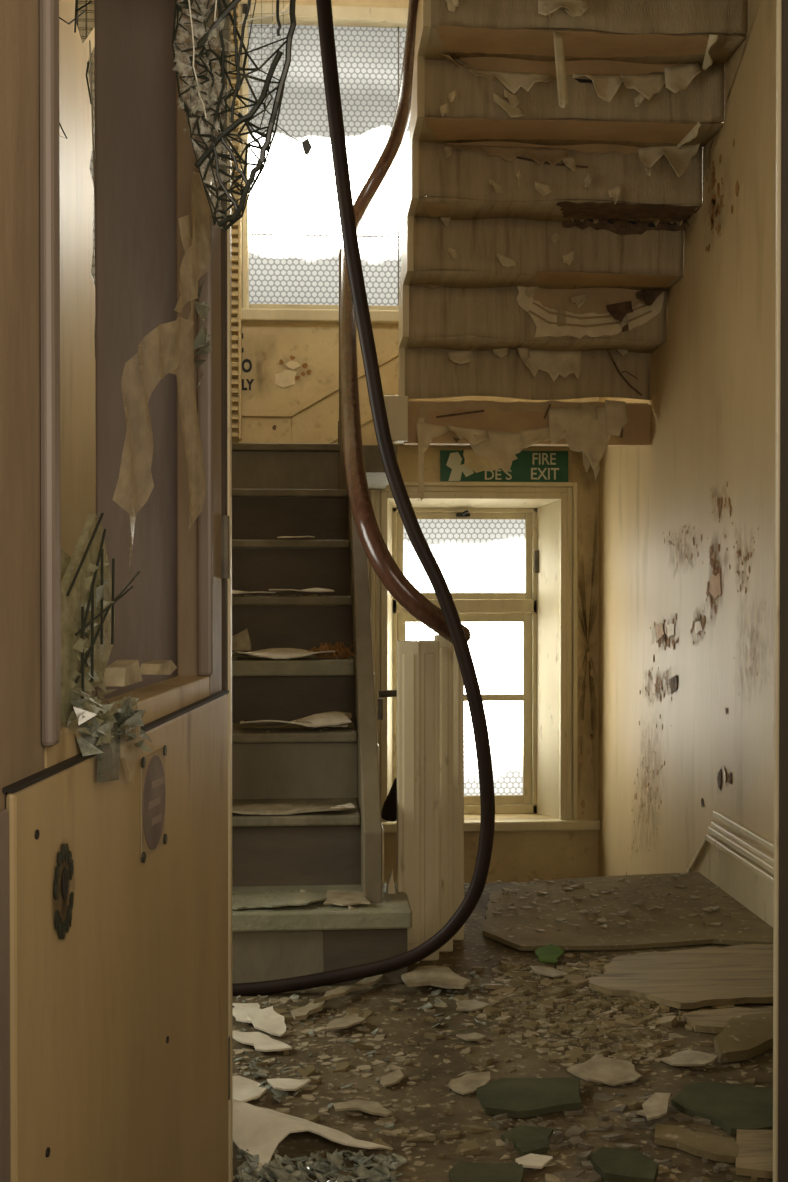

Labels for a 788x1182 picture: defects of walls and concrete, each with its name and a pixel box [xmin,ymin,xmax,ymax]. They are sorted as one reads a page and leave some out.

peeling [425,0,718,243]
peeling [493,250,676,382]
peeling [416,400,628,501]